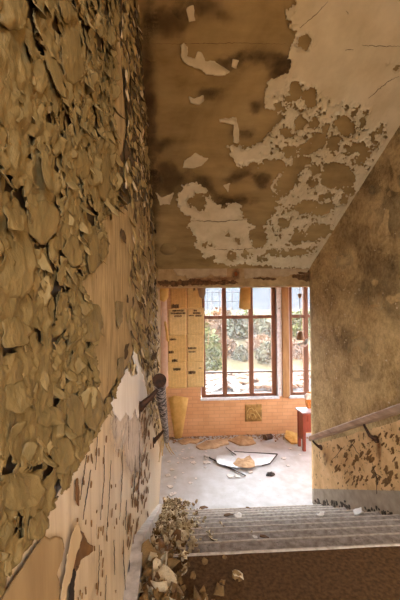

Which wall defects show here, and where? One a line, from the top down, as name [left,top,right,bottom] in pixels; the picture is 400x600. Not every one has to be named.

water stain [257,54,290,78]
water stain [145,96,183,216]
peeling [176,0,400,282]
peeling [0,0,239,600]
spalling [331,428,400,489]